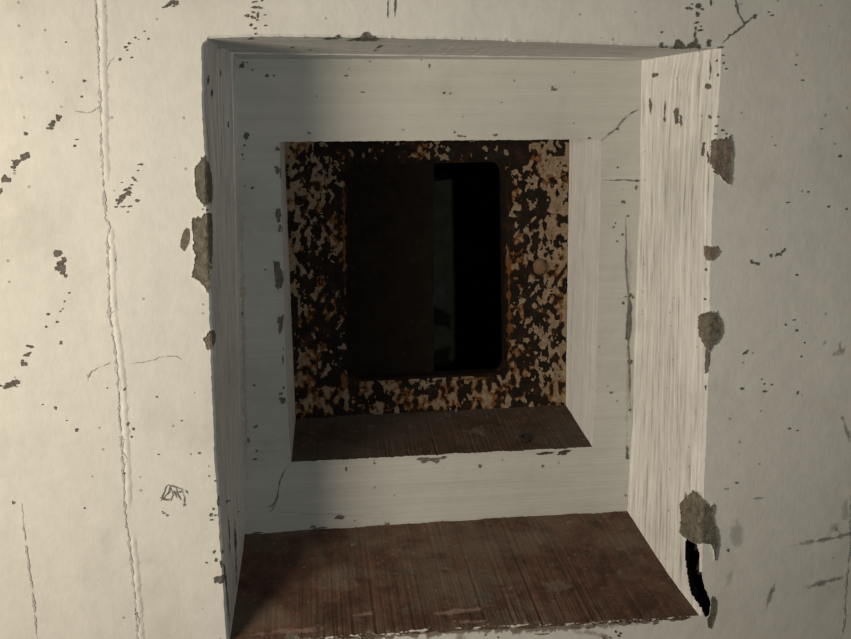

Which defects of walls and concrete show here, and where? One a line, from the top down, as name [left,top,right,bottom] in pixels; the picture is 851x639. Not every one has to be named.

spalling [659,0,727,77]
crack [721,0,774,45]
spalling [701,114,734,185]
spalling [180,155,213,293]
spalling [202,329,216,350]
rust [293,232,568,418]
spalling [697,310,724,374]
crack [268,467,351,520]
spalling [679,490,729,629]